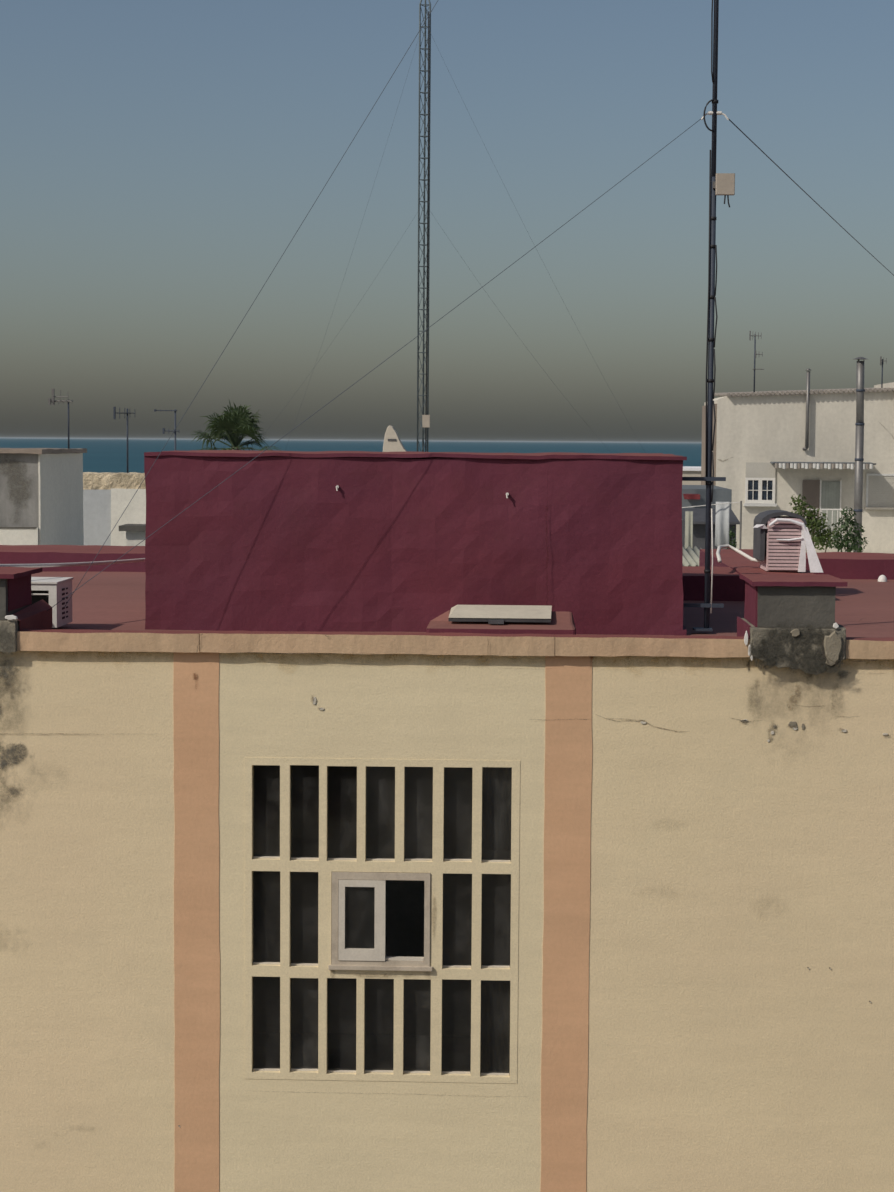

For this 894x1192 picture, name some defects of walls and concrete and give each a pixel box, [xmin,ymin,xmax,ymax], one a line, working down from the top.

flaking render [823,623,844,666]
mould [0,744,26,769]